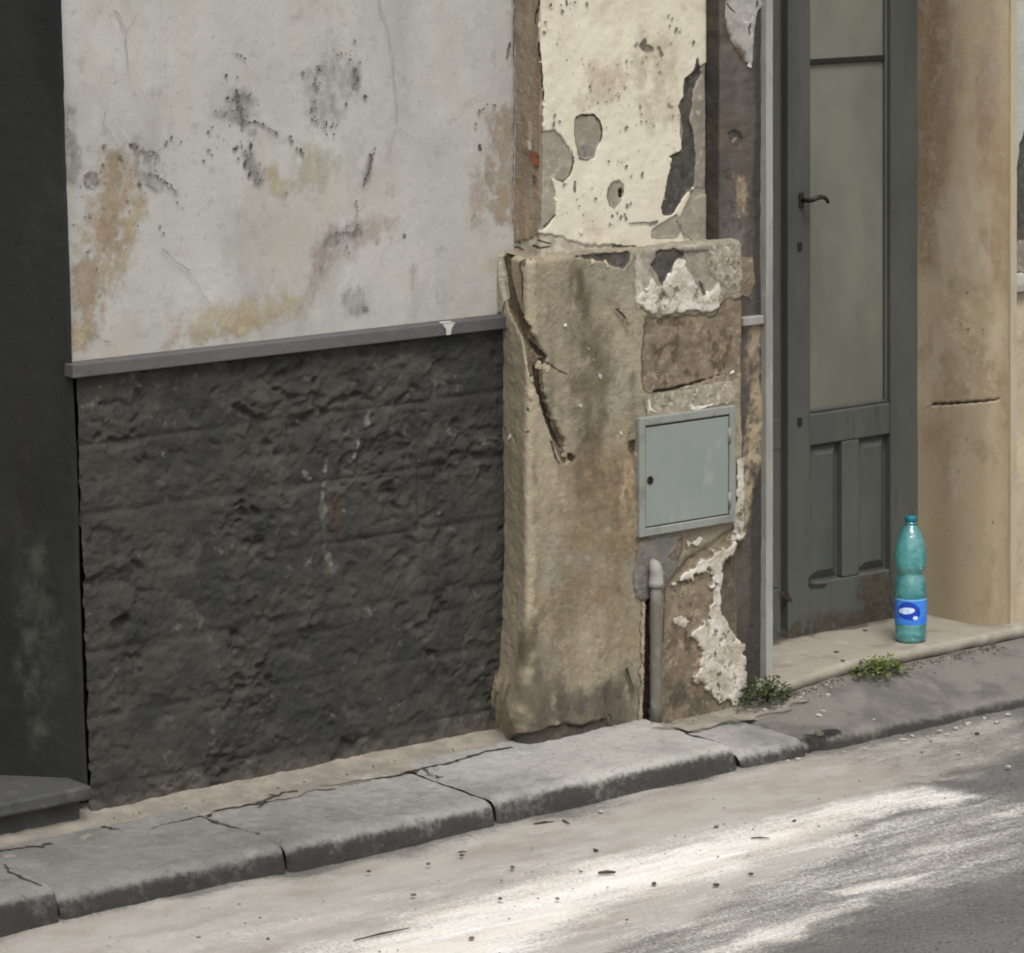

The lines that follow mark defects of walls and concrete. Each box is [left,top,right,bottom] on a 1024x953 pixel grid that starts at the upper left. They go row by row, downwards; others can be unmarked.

peeling [723,0,762,68]
water stain [71,152,145,348]
flaking render [497,0,743,394]
crack [503,253,574,464]
crack [925,398,1000,408]
flaking render [625,457,747,724]
flaking render [510,714,612,744]